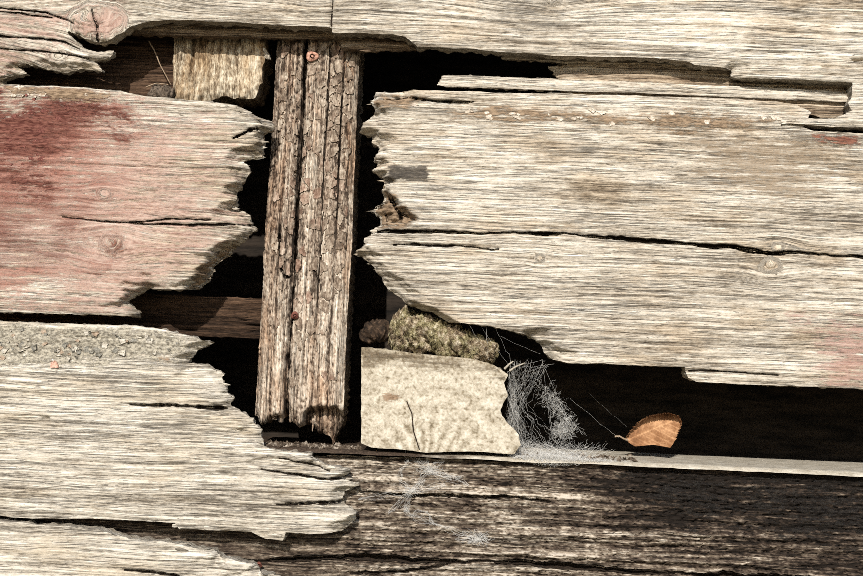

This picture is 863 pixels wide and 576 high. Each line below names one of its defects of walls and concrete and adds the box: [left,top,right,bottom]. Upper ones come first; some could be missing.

crack [0,7,99,59]
peeling [0,85,133,201]
crack [62,216,251,227]
crack [377,192,863,258]
crack [129,403,227,411]